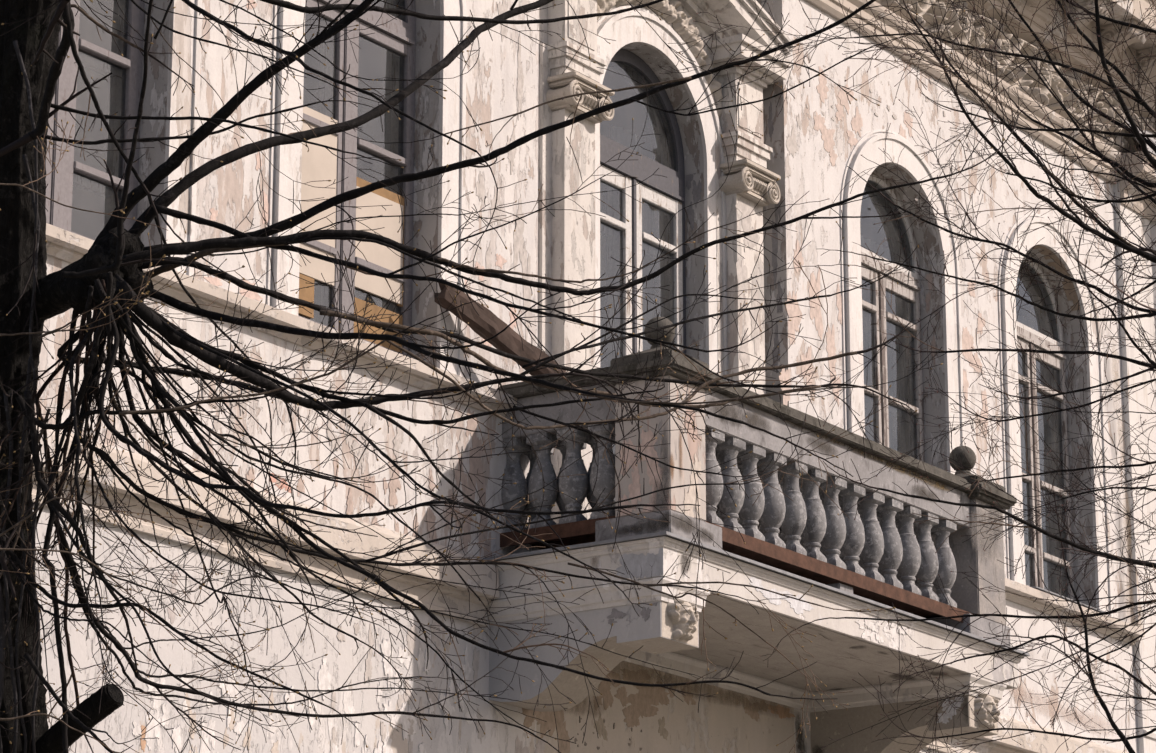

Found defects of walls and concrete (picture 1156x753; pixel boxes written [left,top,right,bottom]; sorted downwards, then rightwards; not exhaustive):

flaking render [785,43,925,178]
peeling [132,620,486,753]
flaking render [515,668,676,753]